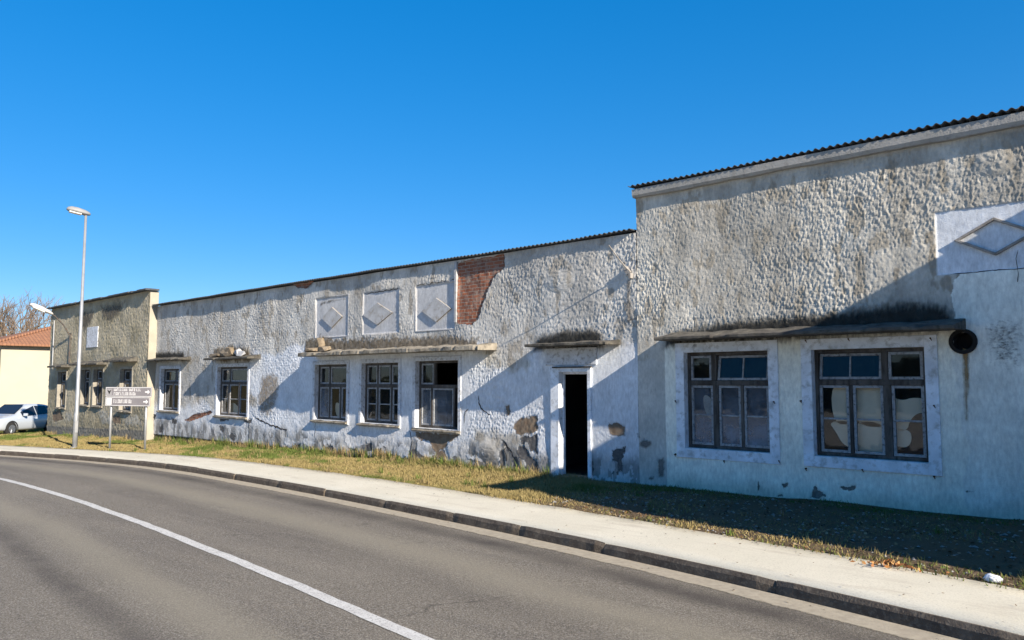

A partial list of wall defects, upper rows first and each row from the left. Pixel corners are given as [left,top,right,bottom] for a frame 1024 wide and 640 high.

flaking render [457,254,505,325]
flaking render [154,411,236,442]
flaking render [500,405,538,472]
peeling [608,423,626,475]